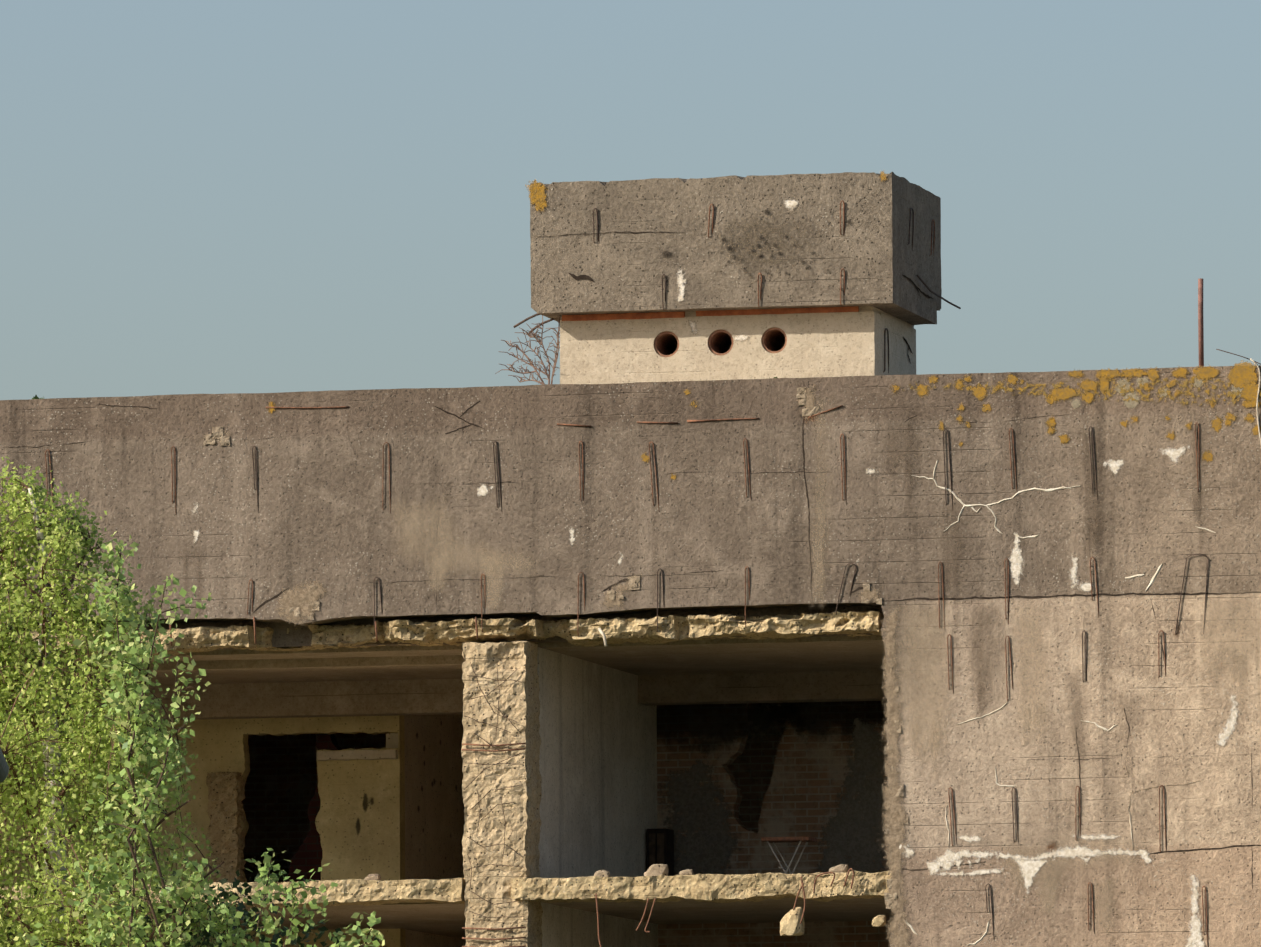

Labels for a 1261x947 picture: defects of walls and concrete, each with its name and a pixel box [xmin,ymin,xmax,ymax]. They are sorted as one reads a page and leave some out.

crack [911,460,1077,539]
water stain [1008,533,1023,584]
spalling [462,743,526,752]
flaking render [205,771,246,883]
spalling [356,794,374,834]
water stain [926,834,1154,893]
spalling [462,926,526,947]
water stain [1185,875,1204,947]